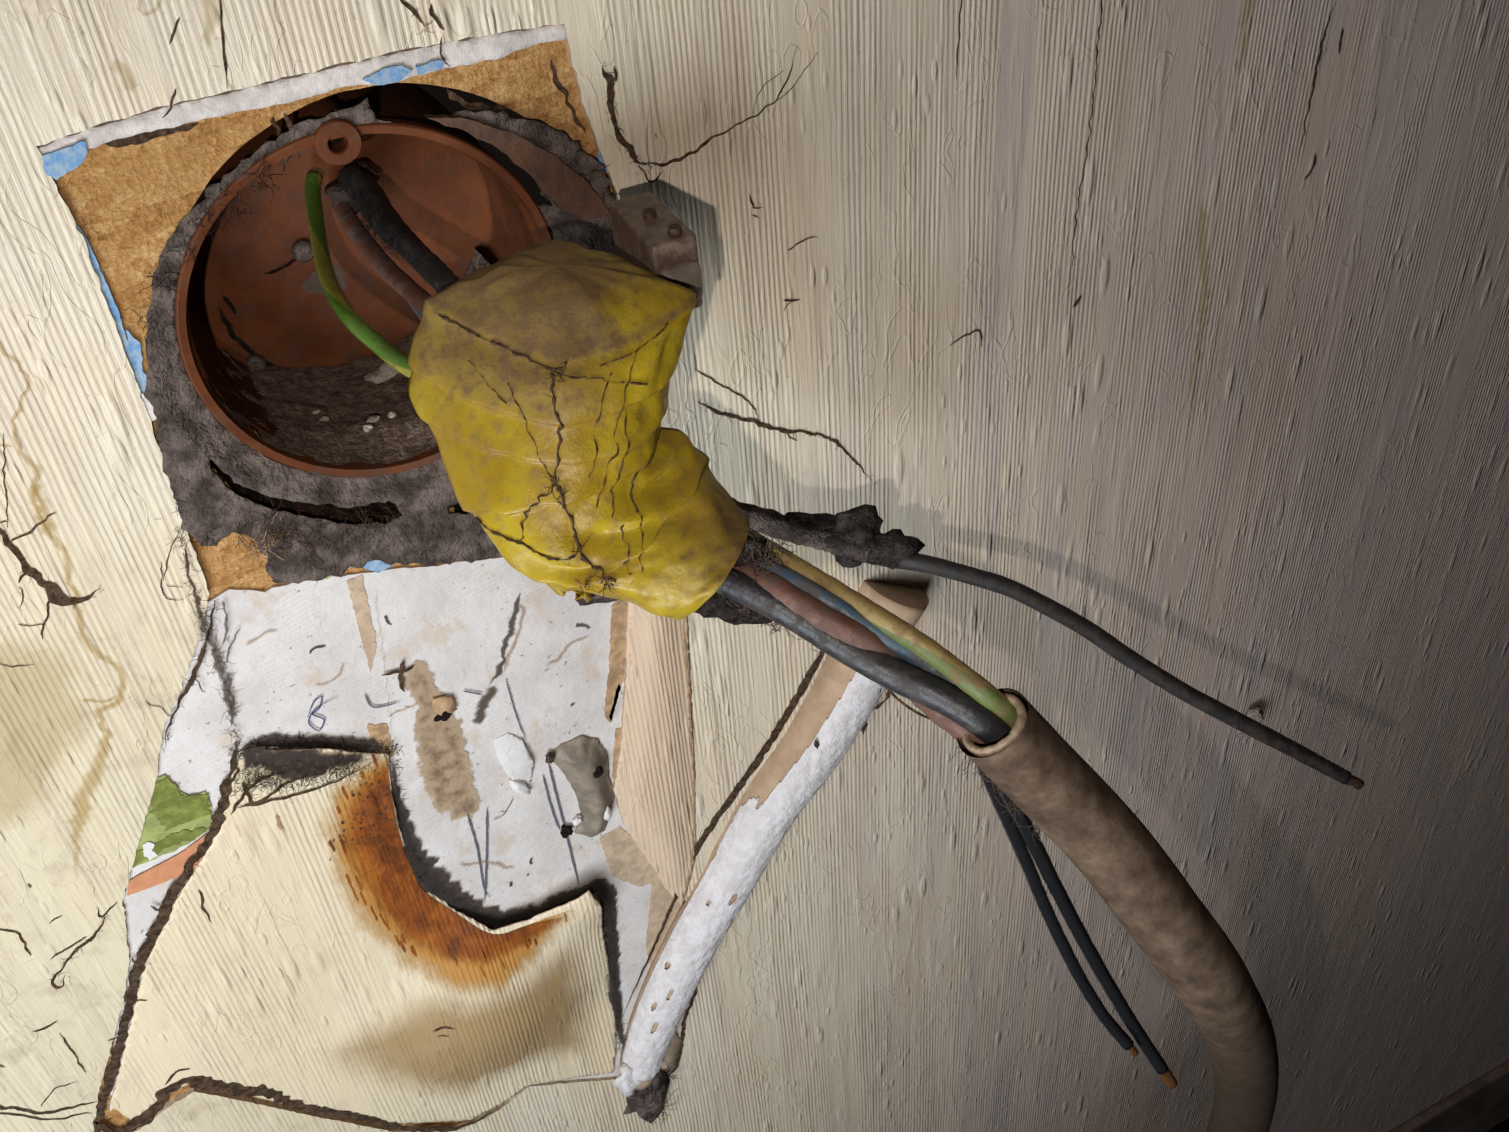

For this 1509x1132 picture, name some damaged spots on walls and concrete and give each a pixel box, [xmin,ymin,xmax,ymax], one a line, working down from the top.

crack [400,0,449,66]
crack [602,48,818,183]
spalling [38,24,615,456]
crack [0,437,104,668]
crack [146,535,224,753]
spalling [208,456,402,525]
spalling [449,503,469,514]
crack [695,369,877,484]
crack [0,741,502,1132]
peeling [98,532,685,1129]
corrosion [328,754,567,990]